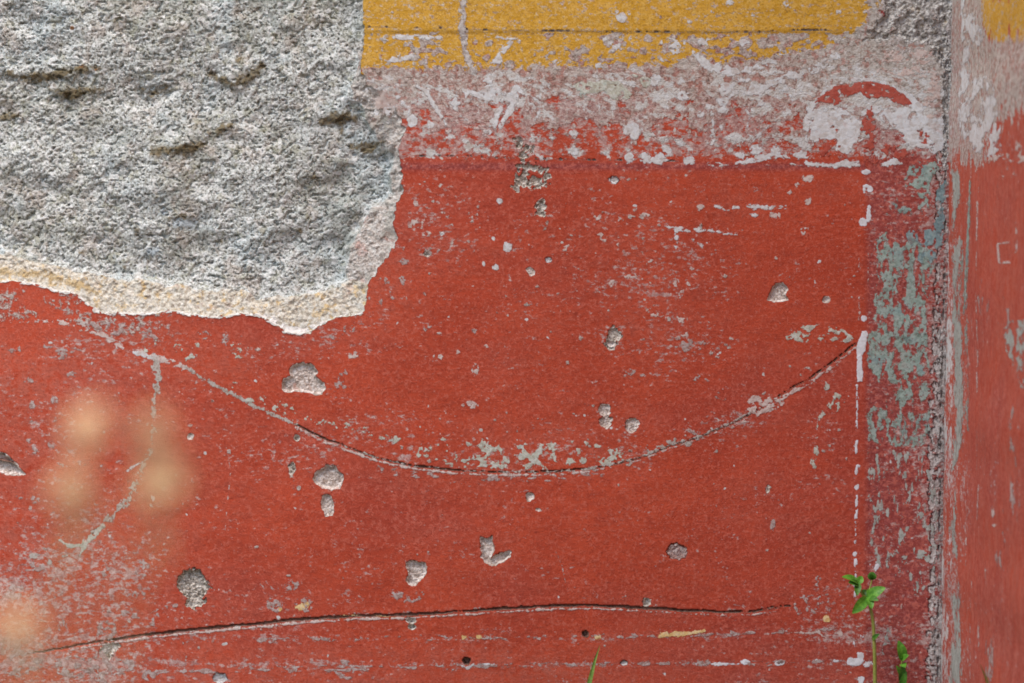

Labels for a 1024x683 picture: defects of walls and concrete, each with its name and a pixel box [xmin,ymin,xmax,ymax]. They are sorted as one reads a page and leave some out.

spalling [0,0,541,353]
spalling [511,137,552,217]
spalling [623,0,1024,595]
spalling [245,352,401,444]
crack [19,319,857,477]
spalling [0,452,26,476]
crack [58,458,149,557]
spalling [57,568,212,683]
spalling [313,464,344,517]
spalling [392,560,427,603]
crack [33,604,791,653]
spalling [480,536,512,566]